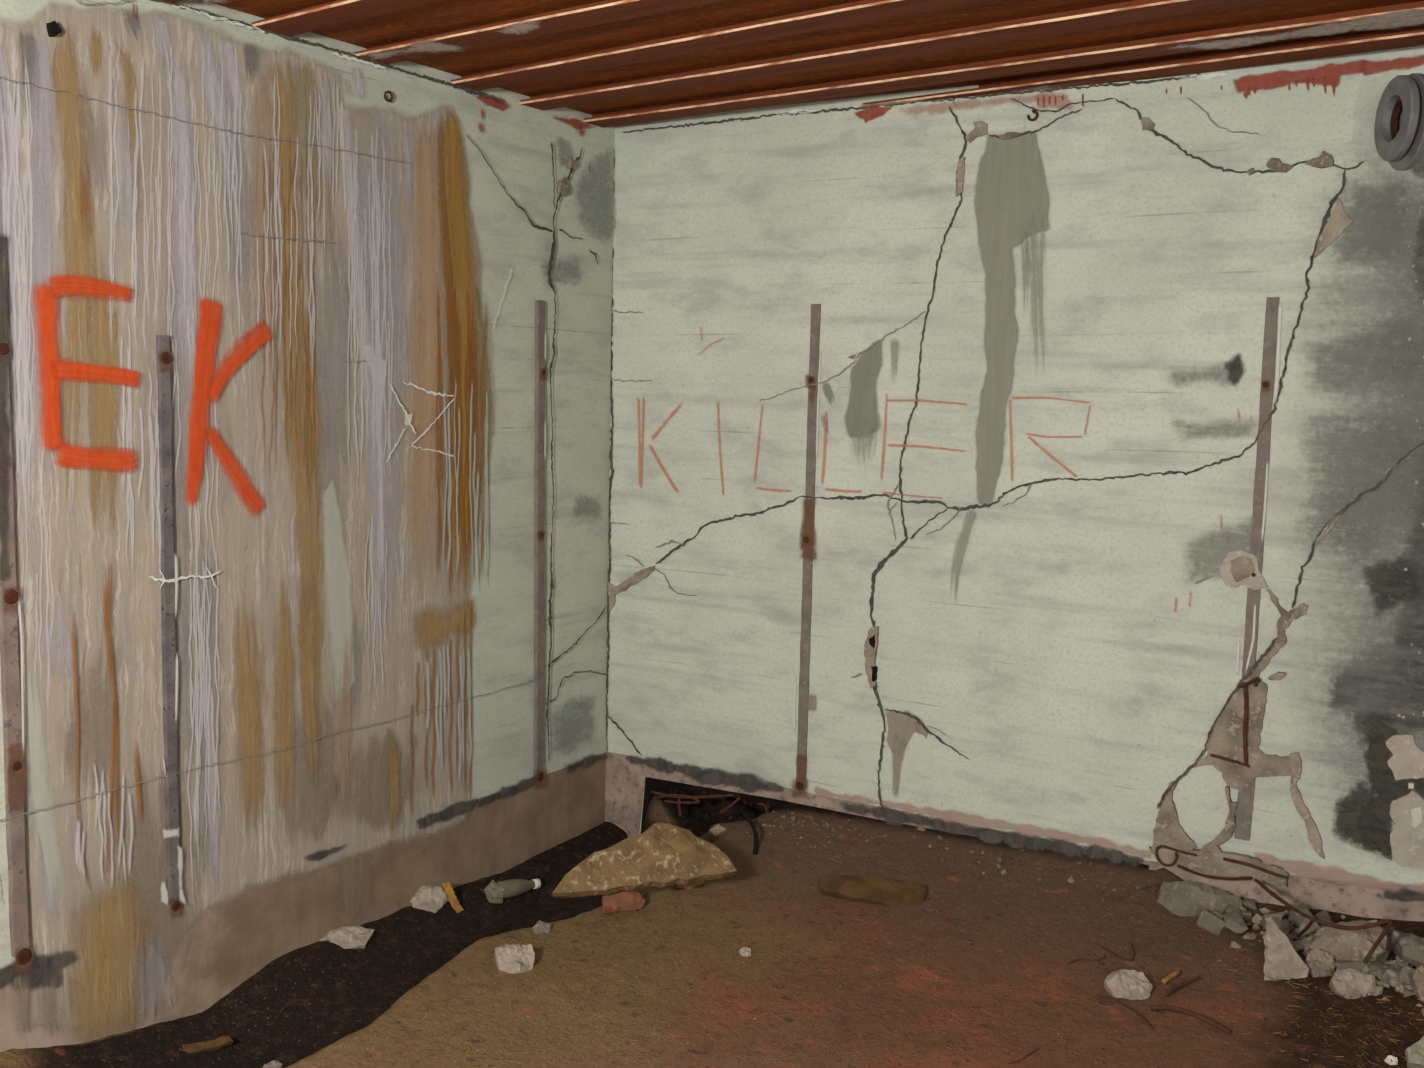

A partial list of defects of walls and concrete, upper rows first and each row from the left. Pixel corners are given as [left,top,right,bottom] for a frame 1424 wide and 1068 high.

corrosion [8,744,26,809]
corrosion [52,32,118,451]
corrosion [72,563,142,882]
corrosion [120,50,140,207]
corrosion [235,65,329,821]
corrosion [389,603,474,827]
corrosion [410,113,491,586]
crack [0,73,1364,821]
damp [953,133,1049,596]
spalling [1149,550,1392,964]
crack [1292,438,1424,608]
damp [1316,188,1424,859]